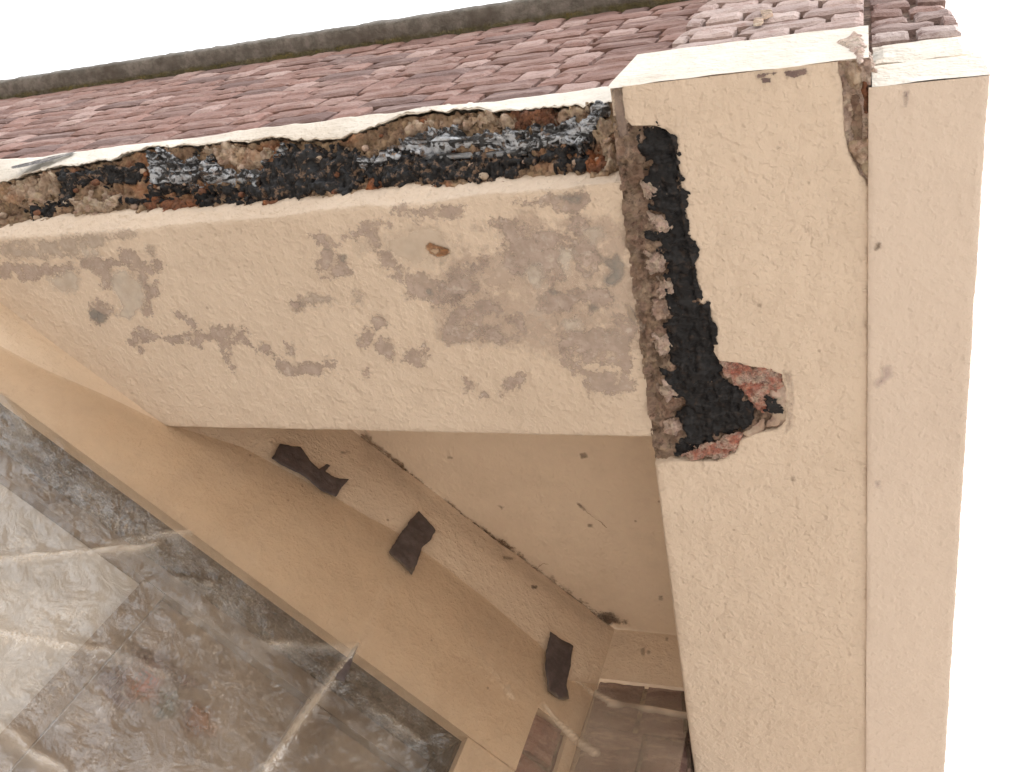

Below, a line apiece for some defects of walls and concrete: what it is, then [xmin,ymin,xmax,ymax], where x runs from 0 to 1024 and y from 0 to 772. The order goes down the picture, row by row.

spalling [836,31,878,183]
damp [390,231,444,258]
spalling [0,88,792,461]
damp [604,255,624,285]
damp [89,309,106,323]